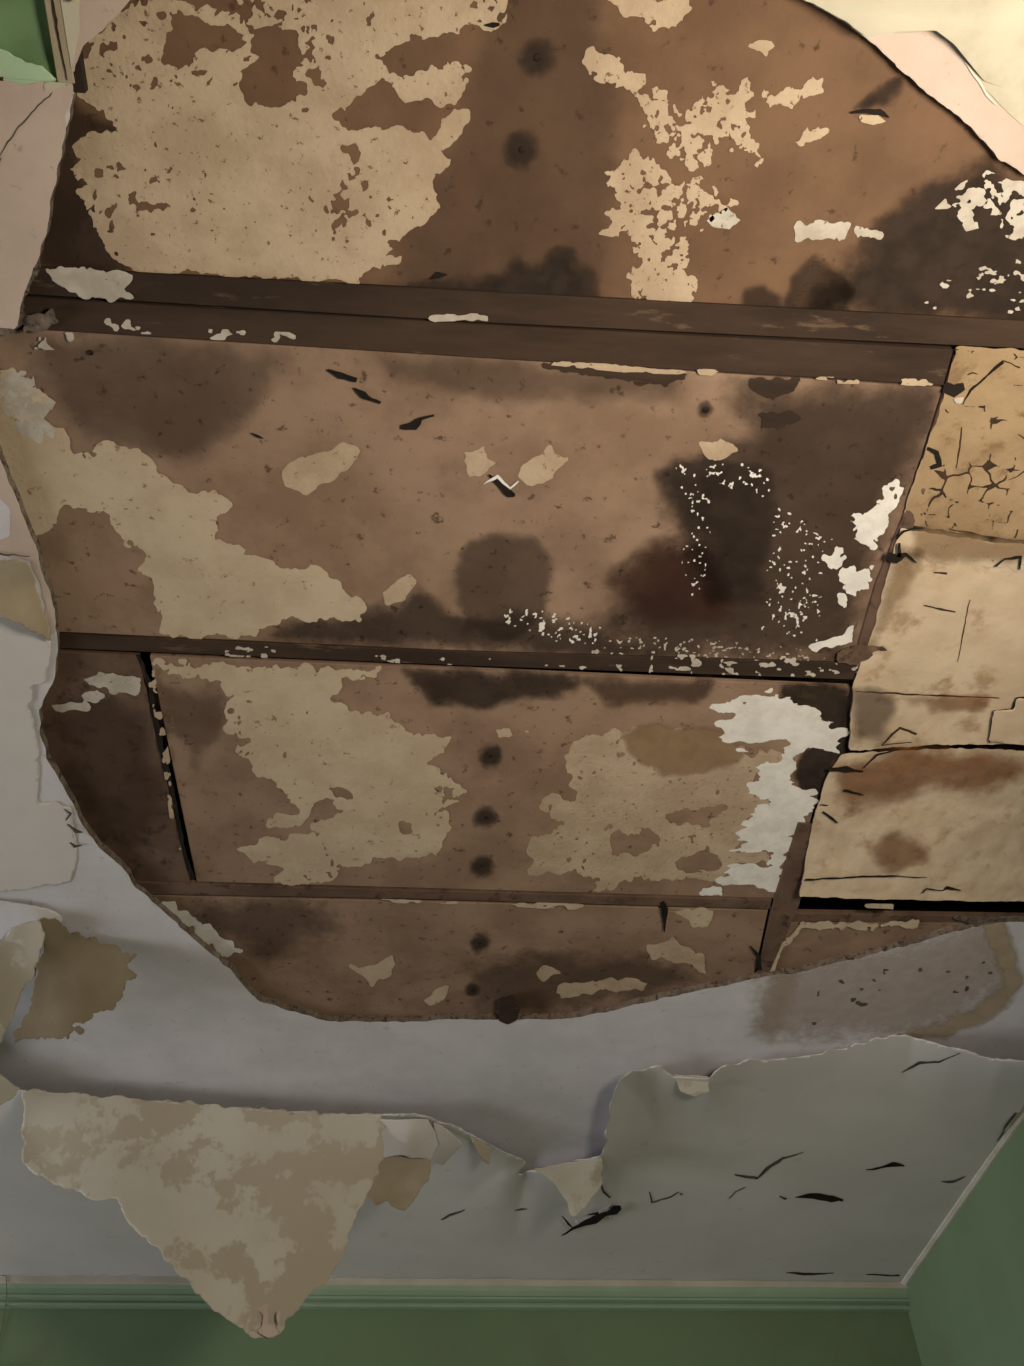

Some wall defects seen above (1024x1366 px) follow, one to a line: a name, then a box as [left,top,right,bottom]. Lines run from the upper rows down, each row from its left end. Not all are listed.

peeling [0,0,129,350]
peeling [634,77,769,232]
leakage [745,163,1024,320]
peeling [869,32,1024,240]
crack [885,349,1024,575]
leakage [225,392,932,797]
peeling [821,546,846,570]
crack [820,691,1024,823]
leakage [763,922,1023,1038]
peeling [0,833,1024,1338]
crack [562,1185,683,1236]
crack [729,1152,843,1202]